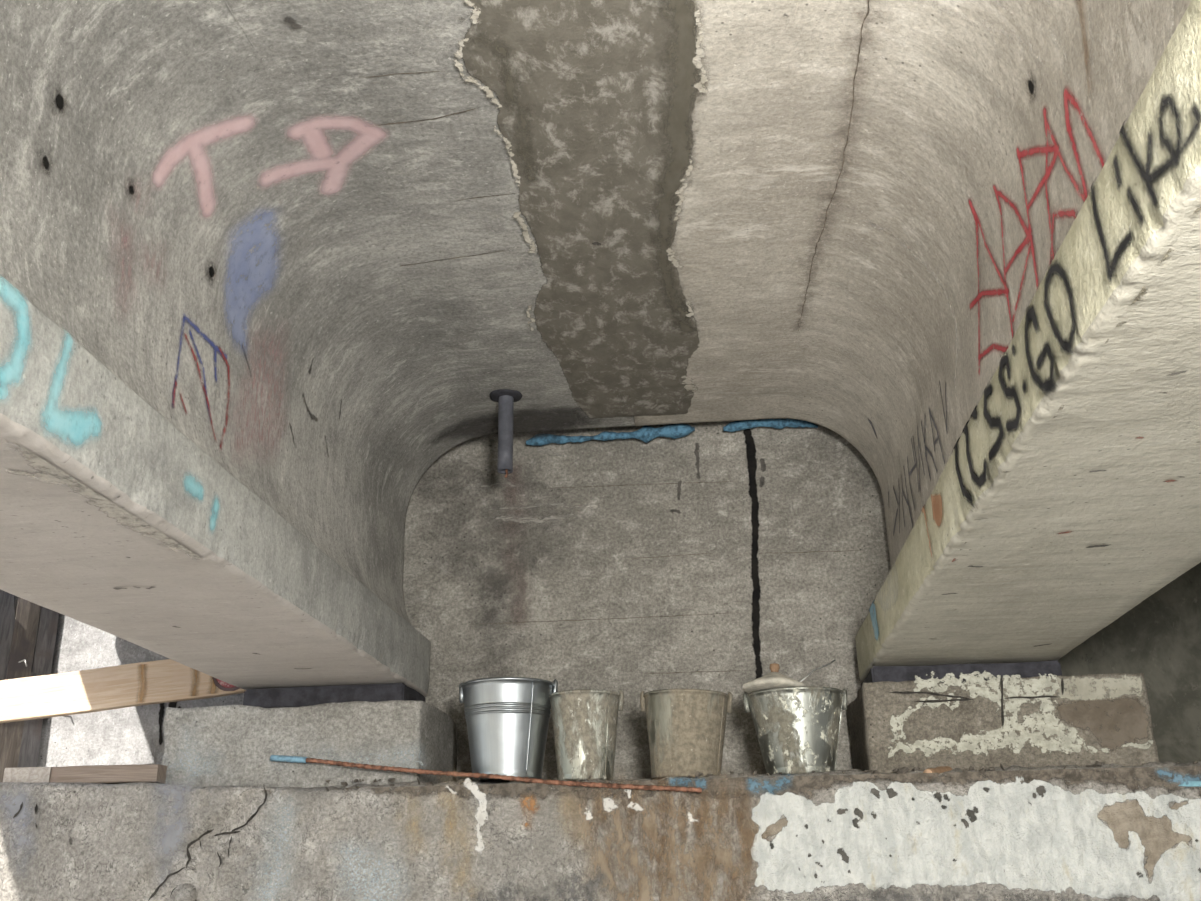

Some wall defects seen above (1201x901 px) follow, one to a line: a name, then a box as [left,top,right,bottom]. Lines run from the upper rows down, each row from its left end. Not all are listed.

spalling [285,16,303,29]
crack [796,0,870,339]
crack [743,429,762,679]
crack [148,787,267,901]
peeling [339,671,1201,901]